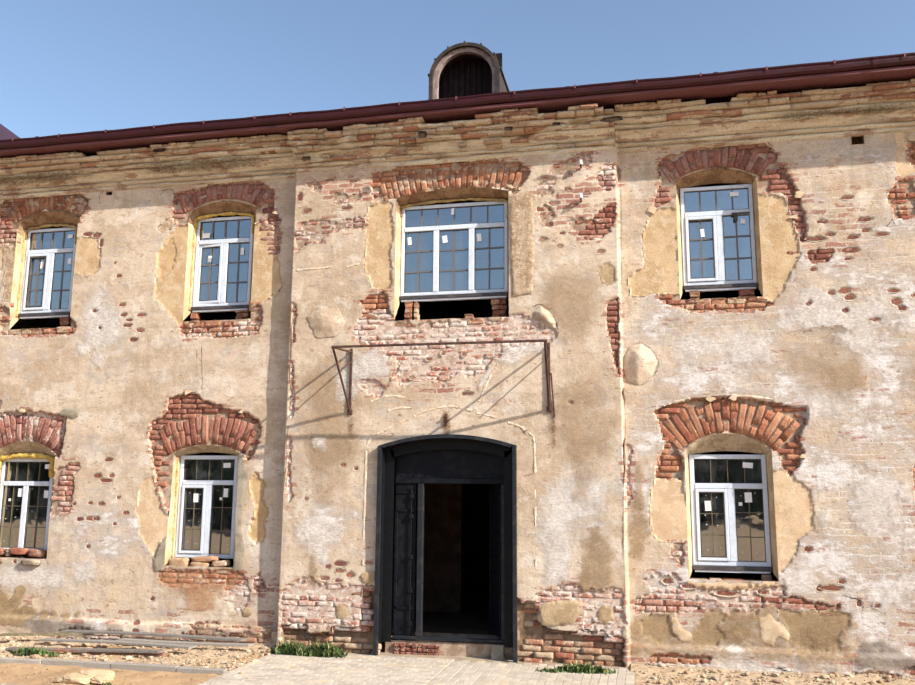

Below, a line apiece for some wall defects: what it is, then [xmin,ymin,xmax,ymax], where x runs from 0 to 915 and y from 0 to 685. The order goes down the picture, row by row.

flaking render [154,181,282,339]
flaking render [294,153,621,412]
water stain [673,330,770,362]
water stain [782,285,889,352]
flaking render [0,401,106,522]
flaking render [112,390,261,556]
flaking render [517,394,880,667]
water stain [852,460,912,537]
water stain [0,562,96,639]
flaking render [179,561,382,654]
water stain [629,606,915,673]
water stain [786,569,817,593]